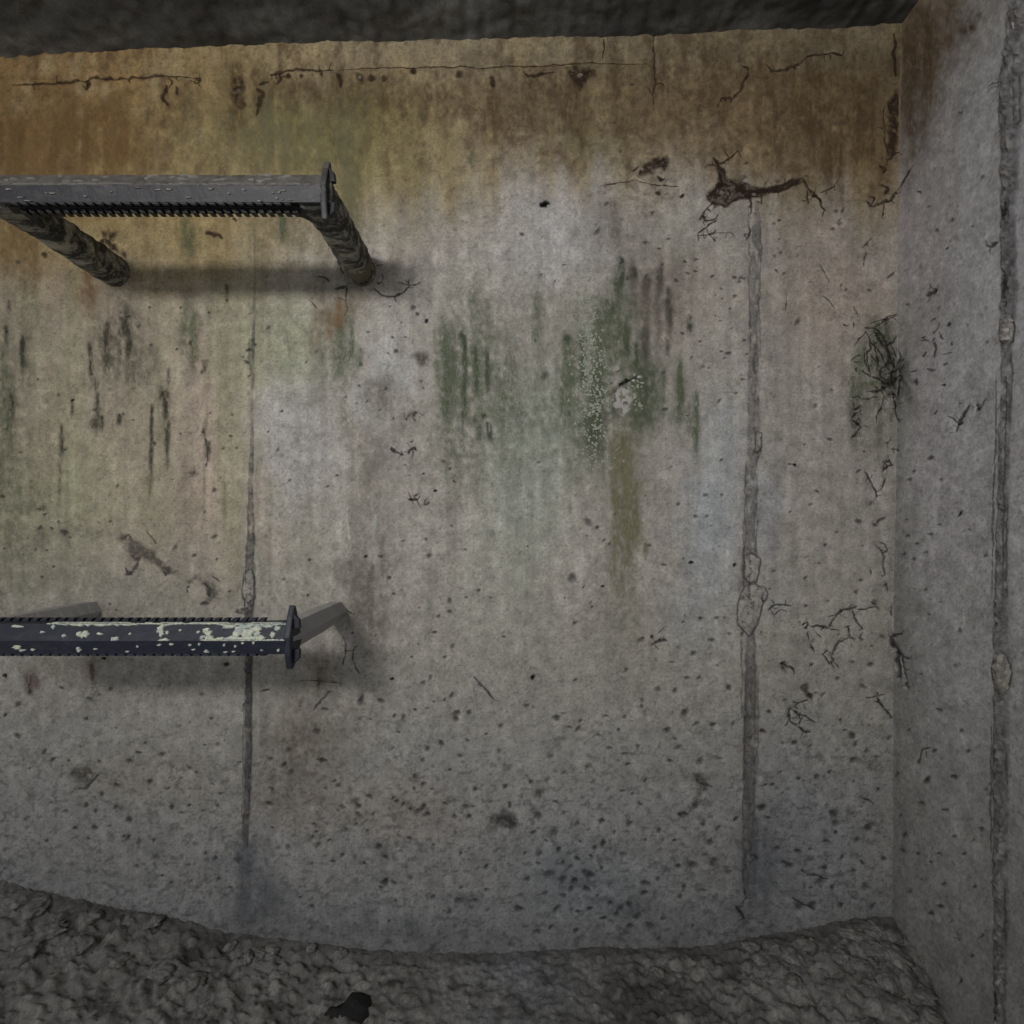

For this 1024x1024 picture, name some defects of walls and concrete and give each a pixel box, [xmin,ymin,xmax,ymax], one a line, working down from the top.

crack [19,74,201,90]
crack [271,37,664,104]
crack [717,51,844,106]
crack [867,99,913,216]
leakage [104,306,130,365]
leakage [149,391,170,462]
leakage [459,332,492,440]
leakage [564,257,672,550]
crack [737,542,911,718]
crack [300,637,359,709]
crack [785,699,815,738]
crack [989,727,1008,851]